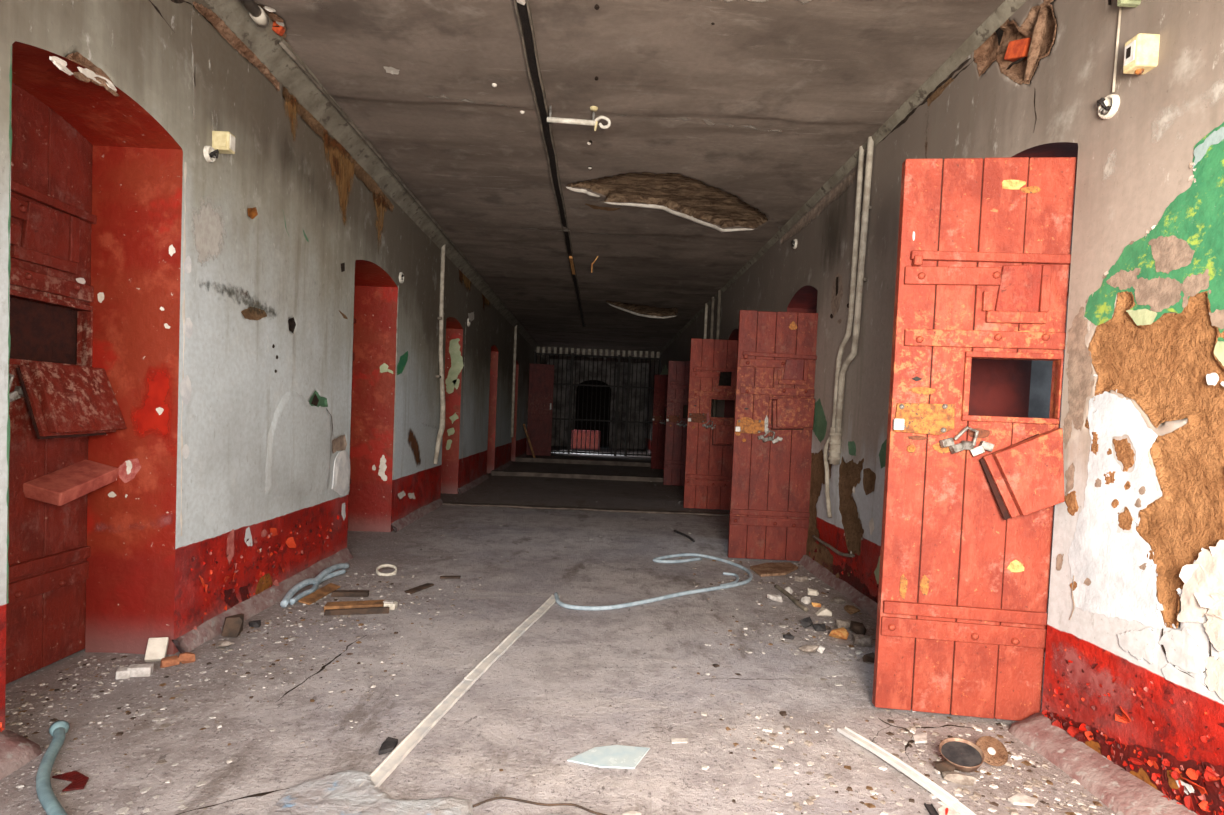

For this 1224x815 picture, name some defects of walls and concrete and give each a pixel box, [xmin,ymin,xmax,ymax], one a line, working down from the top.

spalling [973,0,1057,133]
spalling [566,172,780,233]
peeling [446,413,464,458]
peeling [445,312,474,394]
spalling [806,398,887,604]
spalling [1056,122,1224,630]
crack [276,636,365,702]
peeling [1041,647,1224,815]